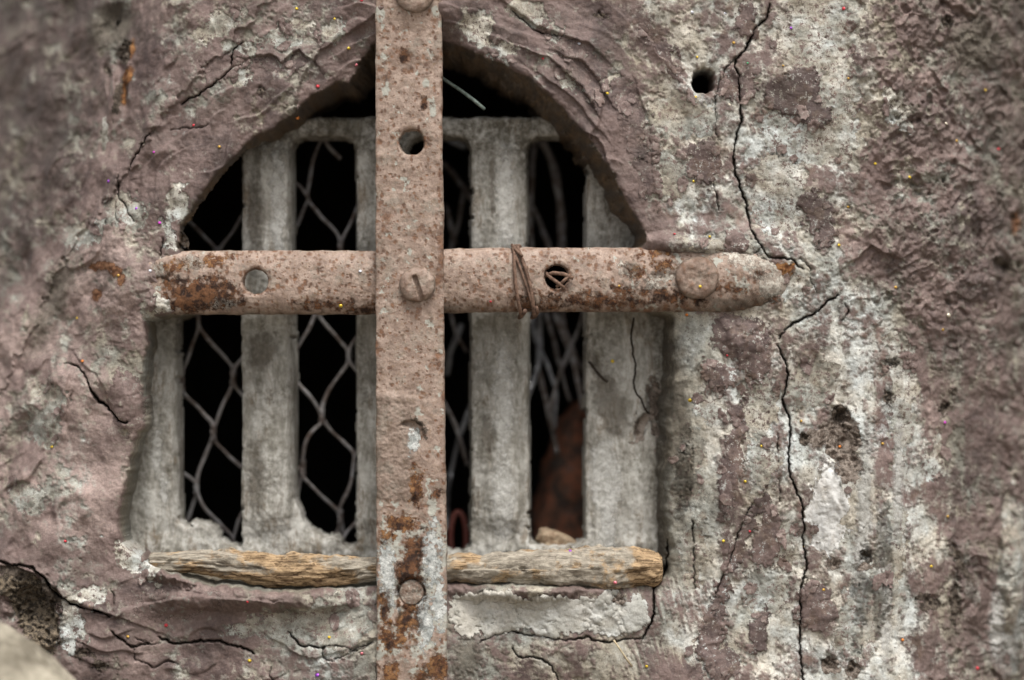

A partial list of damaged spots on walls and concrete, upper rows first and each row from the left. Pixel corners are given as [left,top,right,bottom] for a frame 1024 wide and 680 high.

crack [64,363,127,423]
rust [88,261,125,286]
spalling [138,291,244,543]
rust [151,251,246,315]
spalling [296,141,356,251]
spalling [297,314,357,543]
rust [513,250,798,312]
peeling [504,0,871,251]
crack [713,5,849,679]
crack [0,561,254,668]
rust [376,462,448,680]
crack [485,508,750,678]